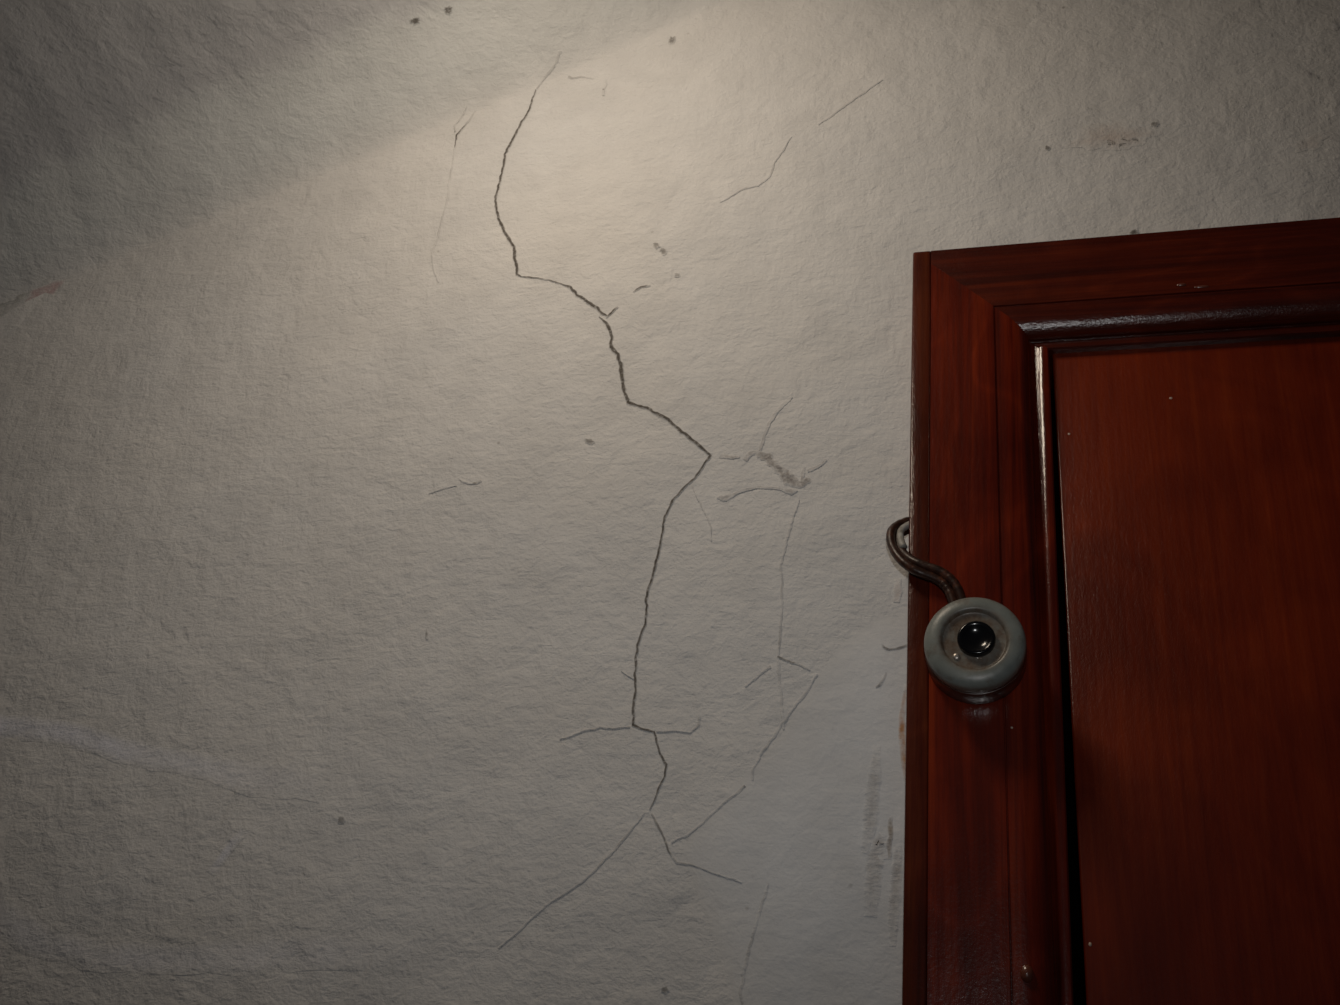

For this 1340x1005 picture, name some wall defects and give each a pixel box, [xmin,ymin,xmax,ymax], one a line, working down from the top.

crack [494,50,819,1005]